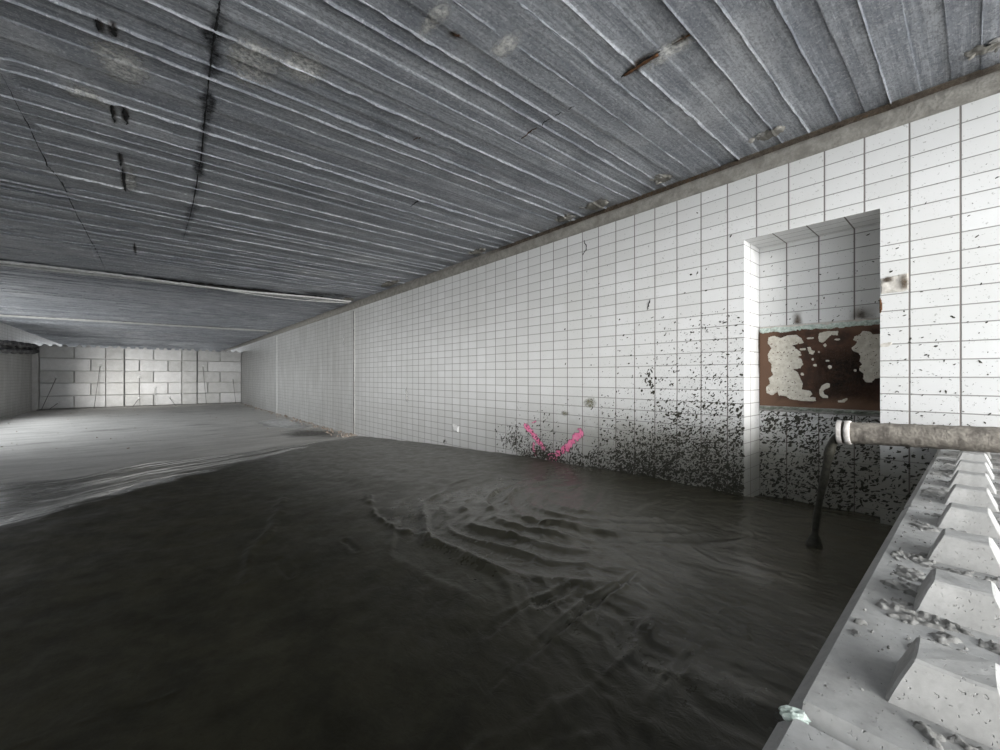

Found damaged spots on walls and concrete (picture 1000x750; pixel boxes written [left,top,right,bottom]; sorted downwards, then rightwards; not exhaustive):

crack [1,74,105,269]
crack [182,0,223,242]
corrosion [621,51,660,77]
corrosion [767,334,878,400]